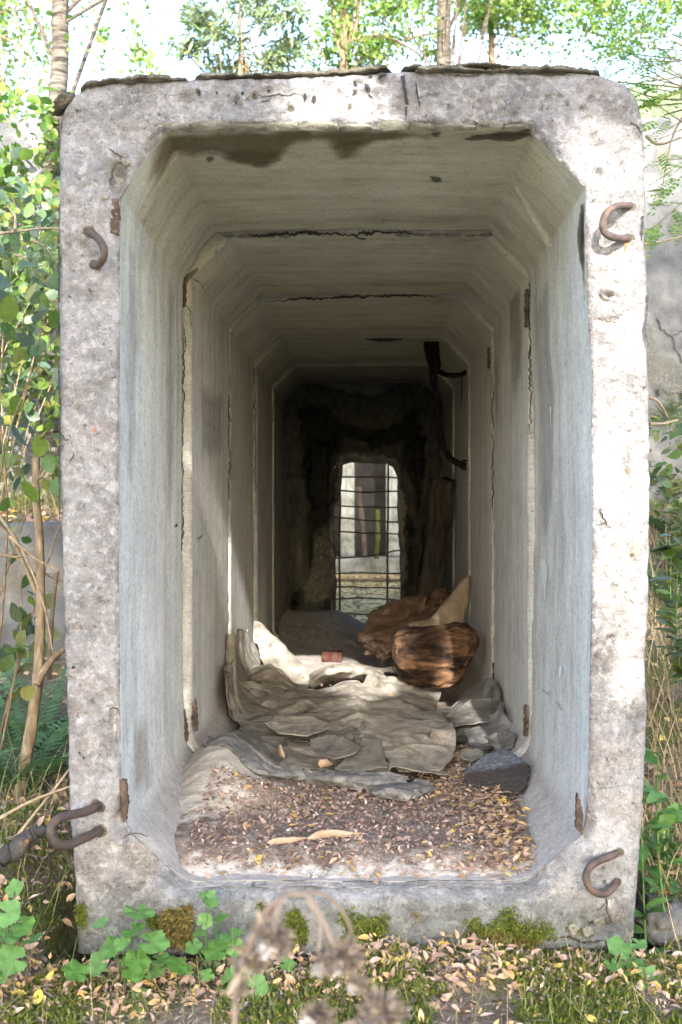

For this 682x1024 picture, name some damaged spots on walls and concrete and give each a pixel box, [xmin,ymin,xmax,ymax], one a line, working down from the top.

damp [157,131,410,174]
crack [241,230,424,240]
crack [265,294,442,303]
crack [175,305,203,583]